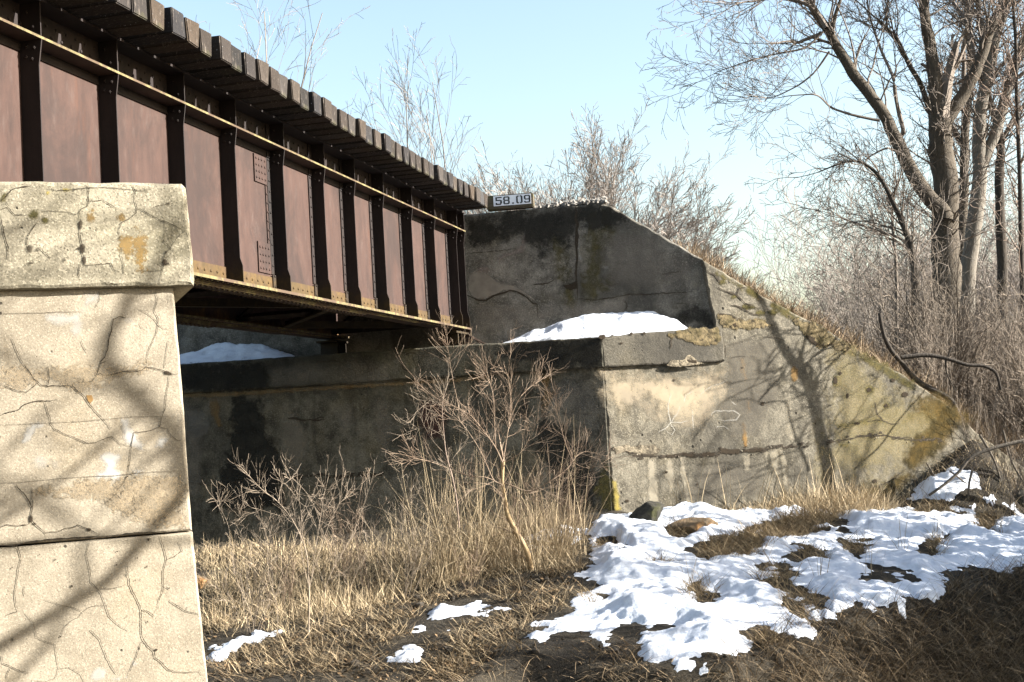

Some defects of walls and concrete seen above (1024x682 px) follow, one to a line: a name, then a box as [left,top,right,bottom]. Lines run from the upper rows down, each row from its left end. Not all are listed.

corrosion [116,213,148,273]
water stain [468,200,627,264]
crack [467,206,784,341]
crack [0,186,203,681]